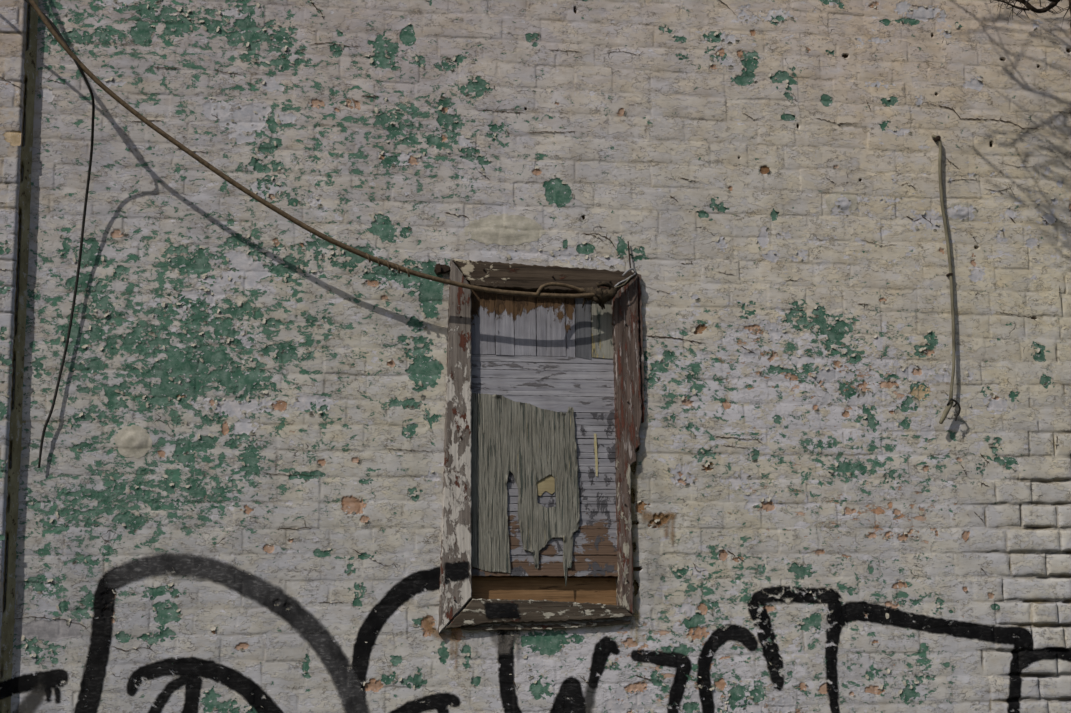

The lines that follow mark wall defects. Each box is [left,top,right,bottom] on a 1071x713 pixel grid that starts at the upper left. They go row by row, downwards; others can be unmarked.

peeling [365,23,475,73]
peeling [201,97,323,211]
peeling [373,76,492,172]
peeling [367,211,412,243]
peeling [18,233,444,535]
peeling [736,301,952,442]
peeling [1031,341,1055,389]
peeling [56,582,187,647]
peeling [202,686,262,713]
peeling [361,655,427,692]
spalling [412,615,481,687]
peeling [663,597,720,658]